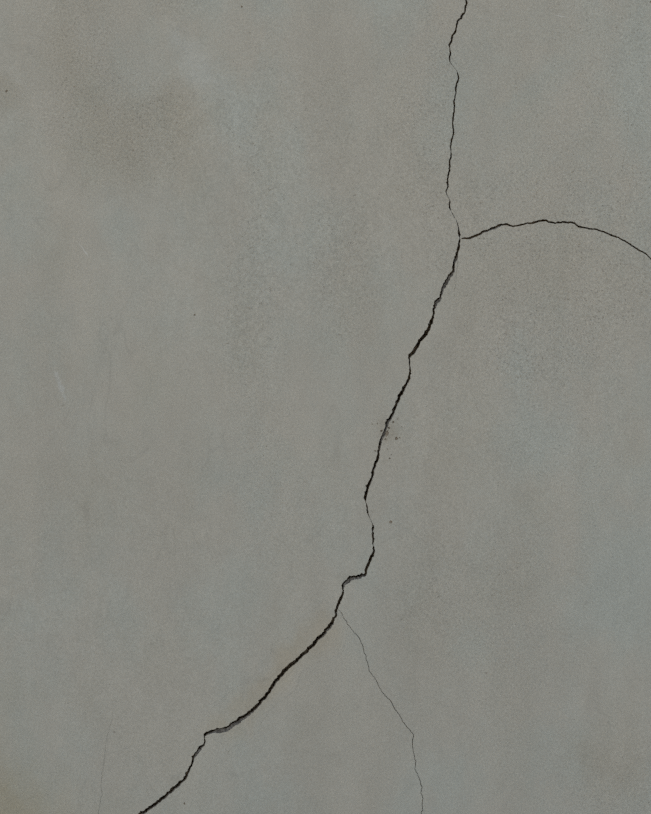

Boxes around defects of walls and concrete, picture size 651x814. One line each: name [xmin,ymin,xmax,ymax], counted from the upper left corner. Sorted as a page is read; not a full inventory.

crack [138,0,651,814]